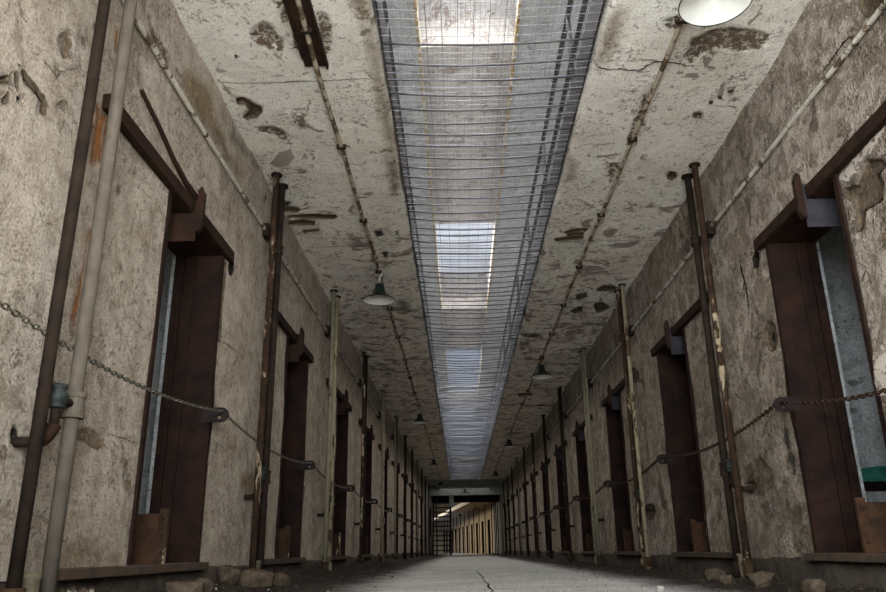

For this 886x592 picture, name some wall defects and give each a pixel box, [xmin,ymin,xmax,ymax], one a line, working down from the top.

peeling [60,29,86,60]
peeling [249,24,298,51]
peeling [316,12,333,53]
crack [593,59,693,72]
peeling [685,28,770,63]
spalling [0,64,69,115]
corrosion [91,106,107,162]
spalling [235,97,294,167]
spalling [843,159,886,233]